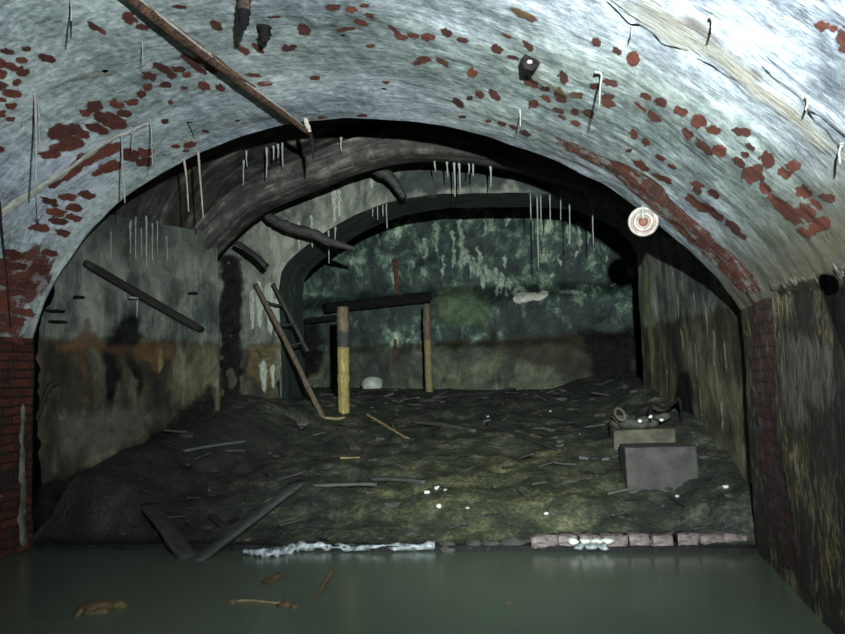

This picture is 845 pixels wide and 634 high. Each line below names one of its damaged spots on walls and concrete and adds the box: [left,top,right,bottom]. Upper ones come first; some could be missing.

peeling [0,46,56,122]
peeling [28,53,226,238]
crack [606,0,845,161]
peeling [633,92,835,239]
peeling [814,20,845,53]
peeling [0,244,58,347]
leakage [103,299,142,411]
leakage [148,255,279,441]
leakage [422,218,548,303]
leakage [438,328,643,377]
peeling [556,129,845,436]
leakage [17,404,92,548]